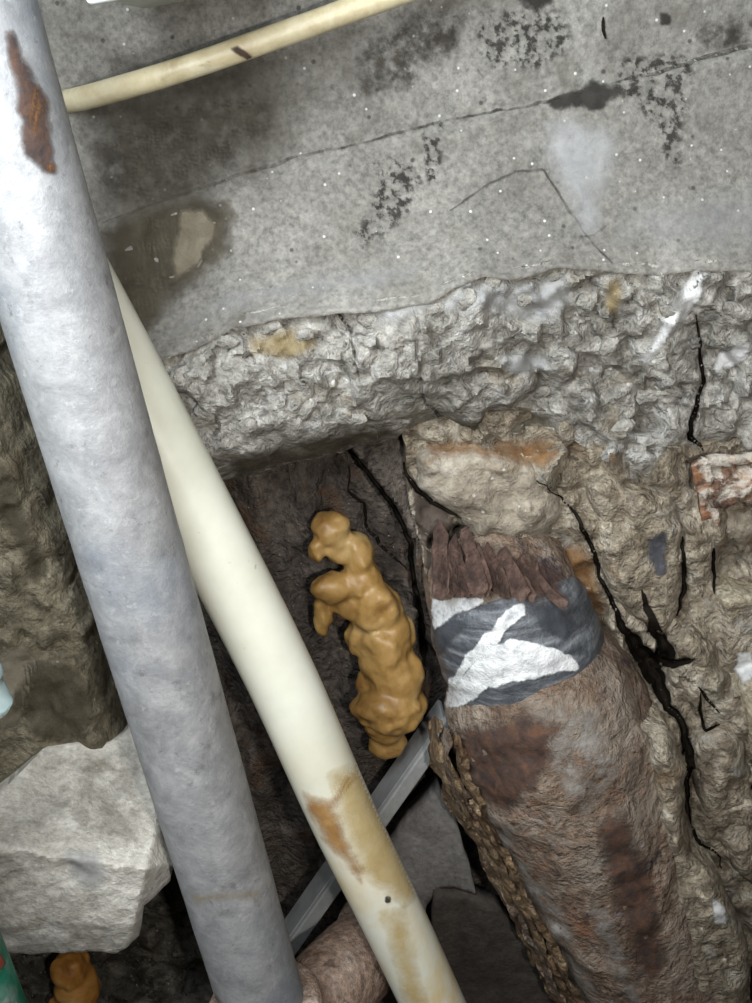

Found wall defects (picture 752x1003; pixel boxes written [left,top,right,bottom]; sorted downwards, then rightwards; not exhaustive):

mould [477,0,569,68]
crack [463,108,503,118]
mould [547,55,691,164]
leakage [95,65,278,325]
crack [450,169,613,263]
efflorescence [641,270,706,362]
crack [687,314,706,451]
spalling [162,258,752,795]
crack [536,480,722,869]
spalling [197,594,326,919]
spalling [385,765,442,832]
spalling [294,889,346,959]